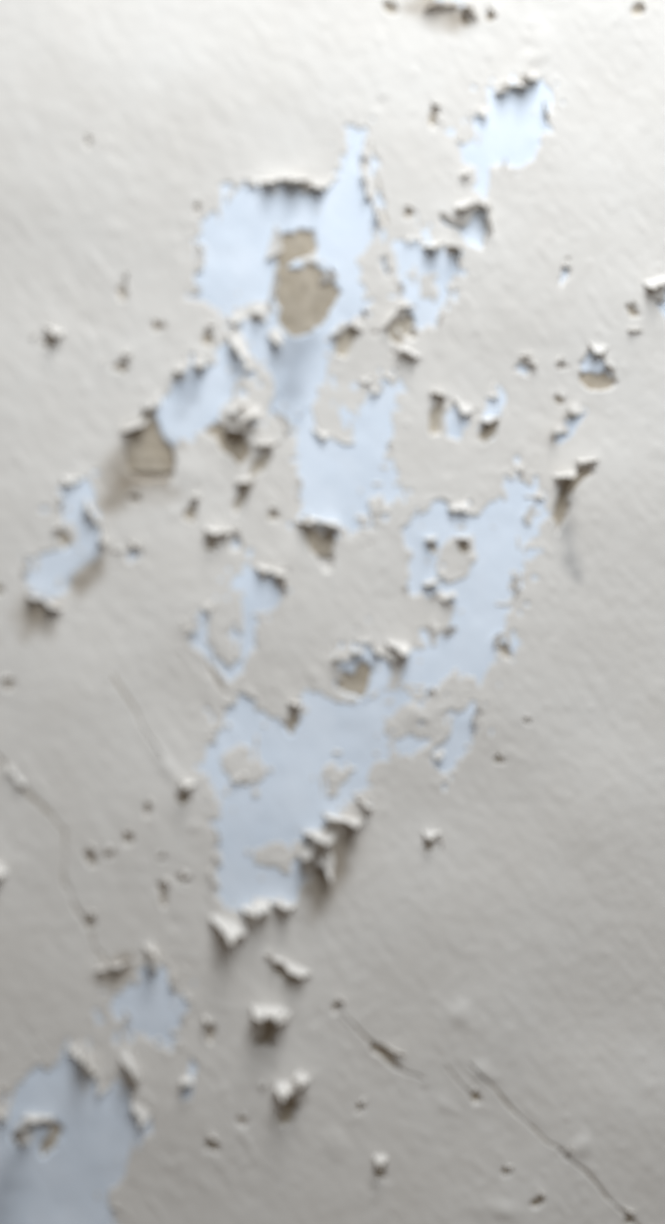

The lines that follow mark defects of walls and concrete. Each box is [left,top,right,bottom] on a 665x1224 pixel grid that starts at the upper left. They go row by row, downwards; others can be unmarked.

peeling [423,0,496,26]
peeling [579,341,617,390]
peeling [642,275,665,316]
peeling [21,462,140,617]
peeling [120,72,599,946]
crack [0,759,53,816]
peeling [0,941,214,1224]
crack [398,1064,637,1224]